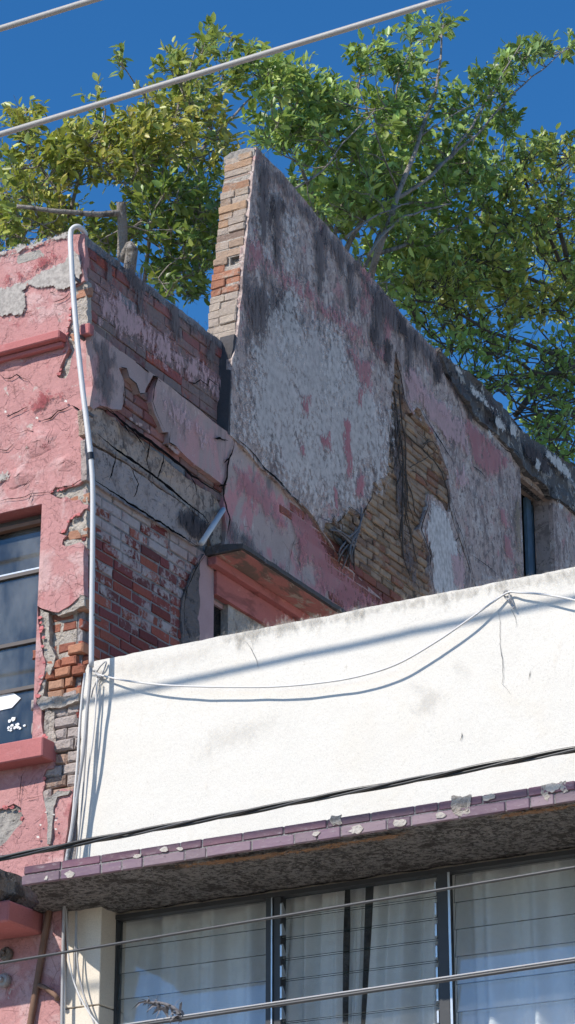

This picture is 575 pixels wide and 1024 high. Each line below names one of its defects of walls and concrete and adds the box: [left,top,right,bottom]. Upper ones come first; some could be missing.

peeling [0,250,221,398]
leakage [245,140,507,431]
spalling [51,482,90,551]
spalling [104,369,222,501]
crack [0,348,386,631]
peeling [236,287,472,612]
spalling [31,595,89,845]
spalling [0,805,24,846]
spalling [329,814,363,834]
spalling [436,793,495,818]
spalling [541,780,569,801]